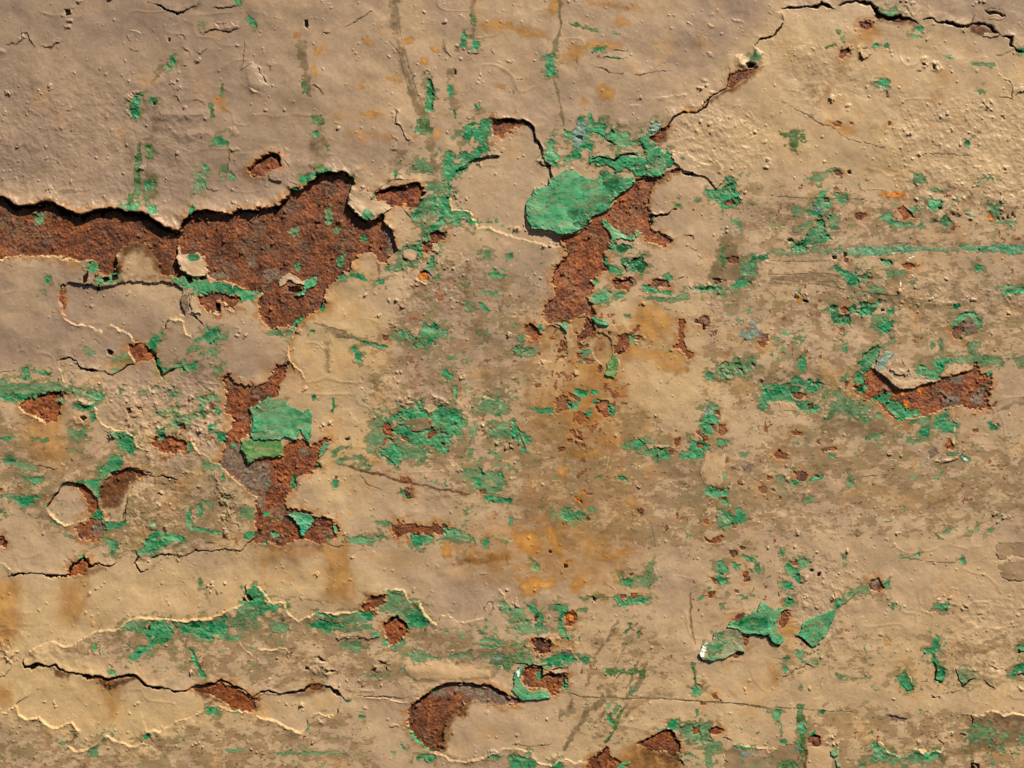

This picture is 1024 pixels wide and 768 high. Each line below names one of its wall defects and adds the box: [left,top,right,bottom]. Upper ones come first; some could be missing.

crack [576,0,1024,178]
peeling [348,185,392,220]
peeling [449,118,636,247]
peeling [175,246,208,276]
peeling [59,282,201,358]
corrosion [0,167,428,593]
corrosion [485,169,769,504]
peeling [875,351,944,389]
peeling [45,481,107,527]
peeling [698,575,836,661]
crack [22,659,419,728]
corrosion [586,726,723,768]